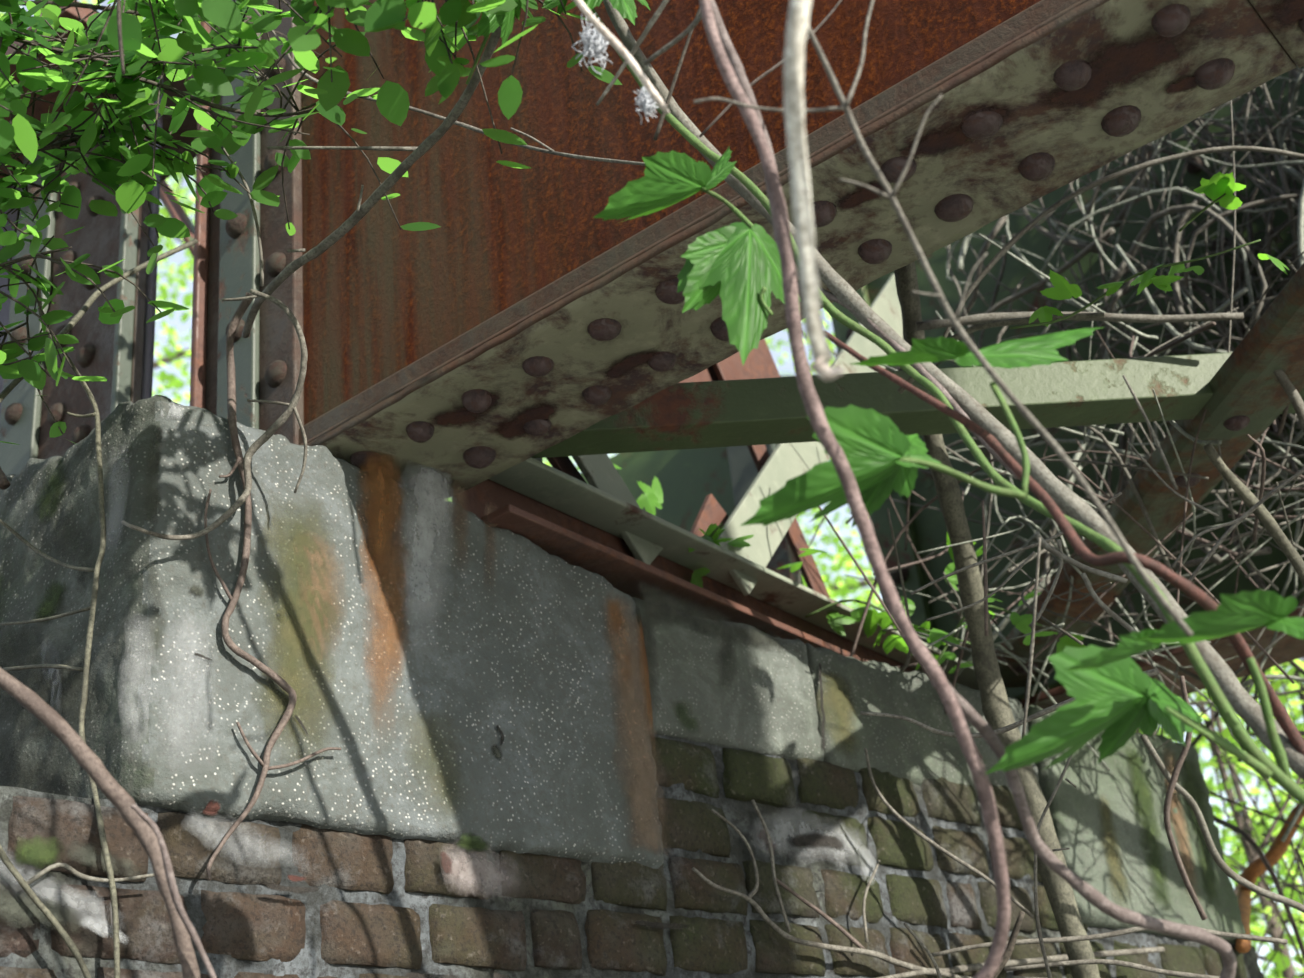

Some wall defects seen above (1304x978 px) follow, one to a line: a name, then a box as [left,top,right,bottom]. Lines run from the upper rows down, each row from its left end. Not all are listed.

corrosion [363,453,401,658]
leakage [442,834,514,895]